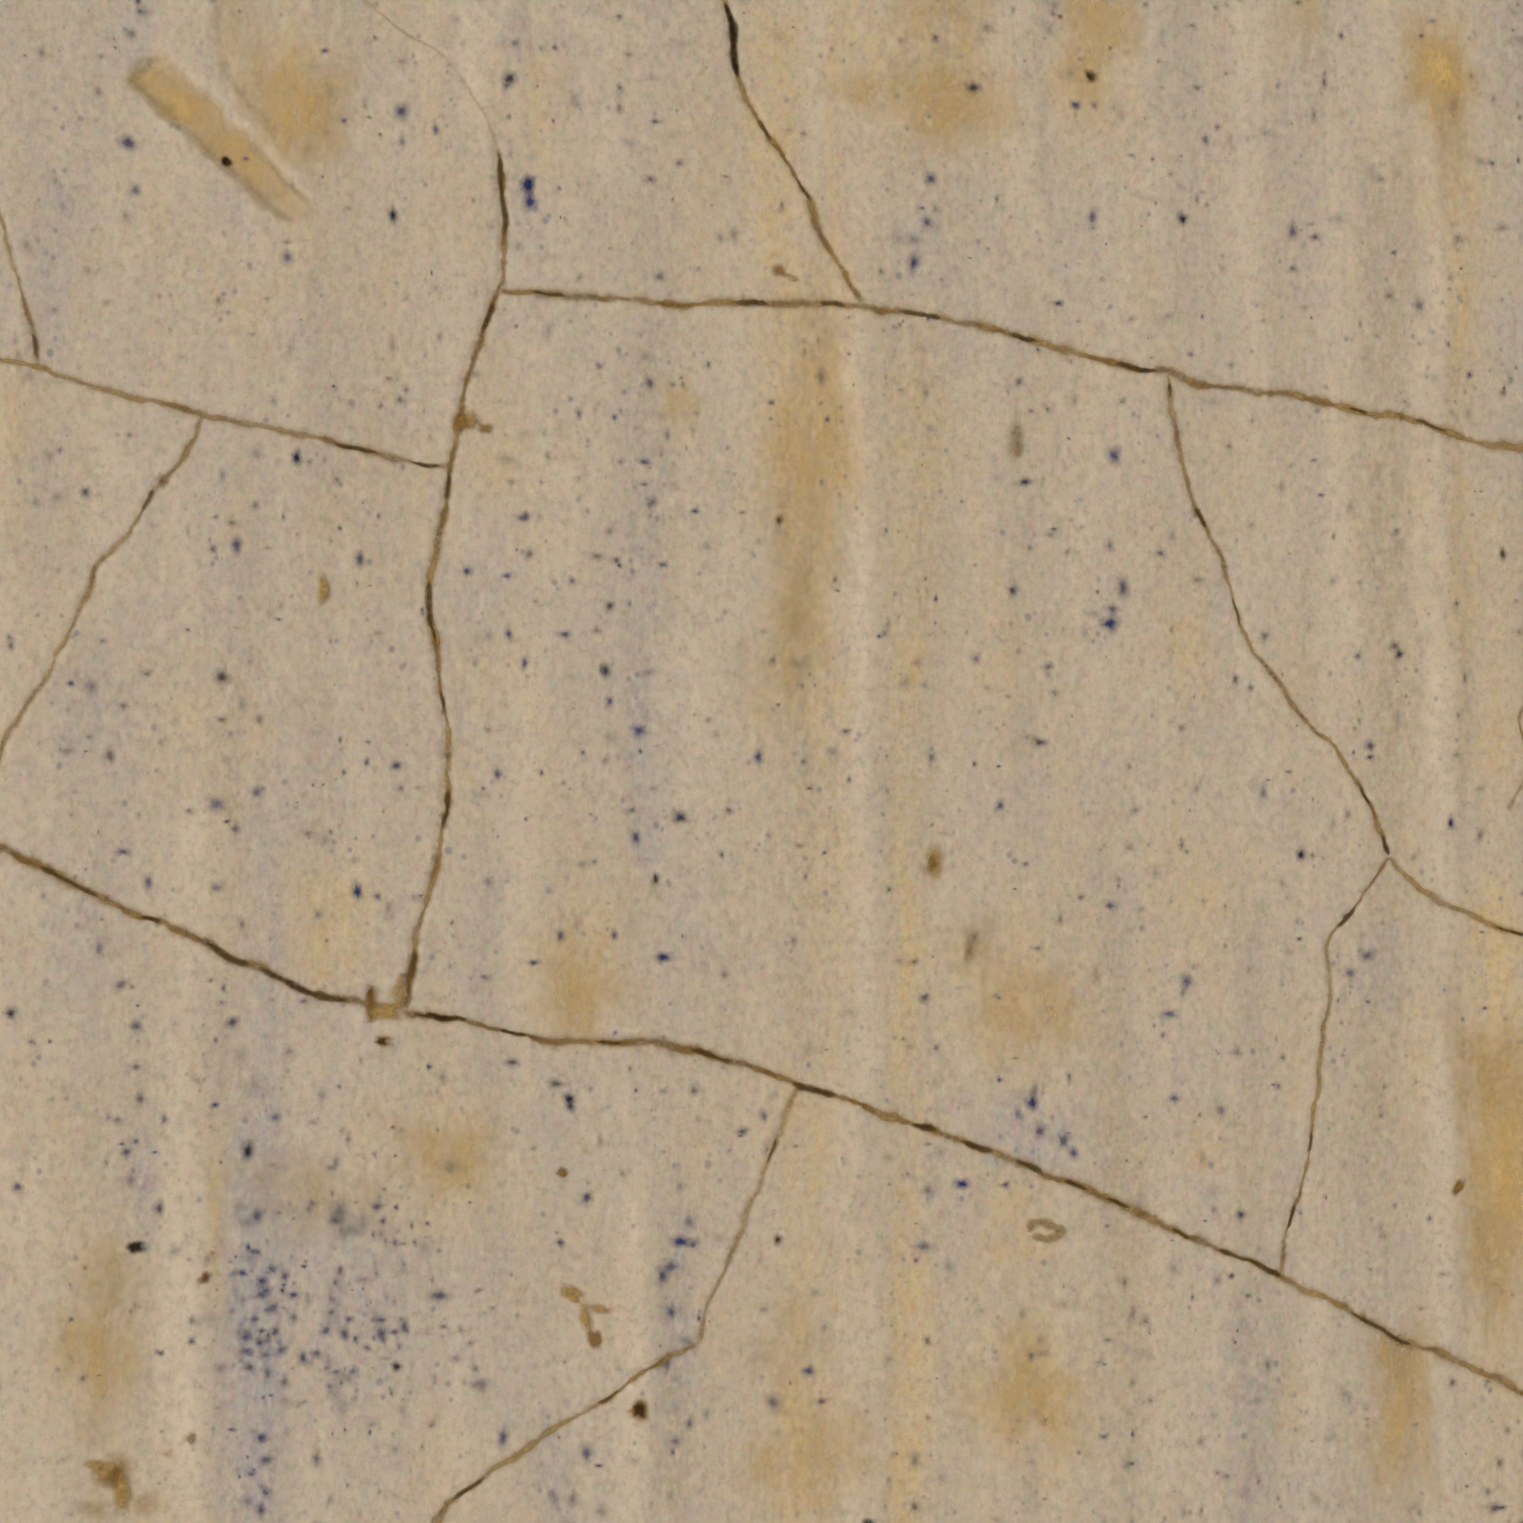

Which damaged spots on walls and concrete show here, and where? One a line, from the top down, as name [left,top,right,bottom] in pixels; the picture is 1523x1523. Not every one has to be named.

crack [0,0,1523,1018]
crack [405,979,1523,1396]
crack [436,1320,704,1523]